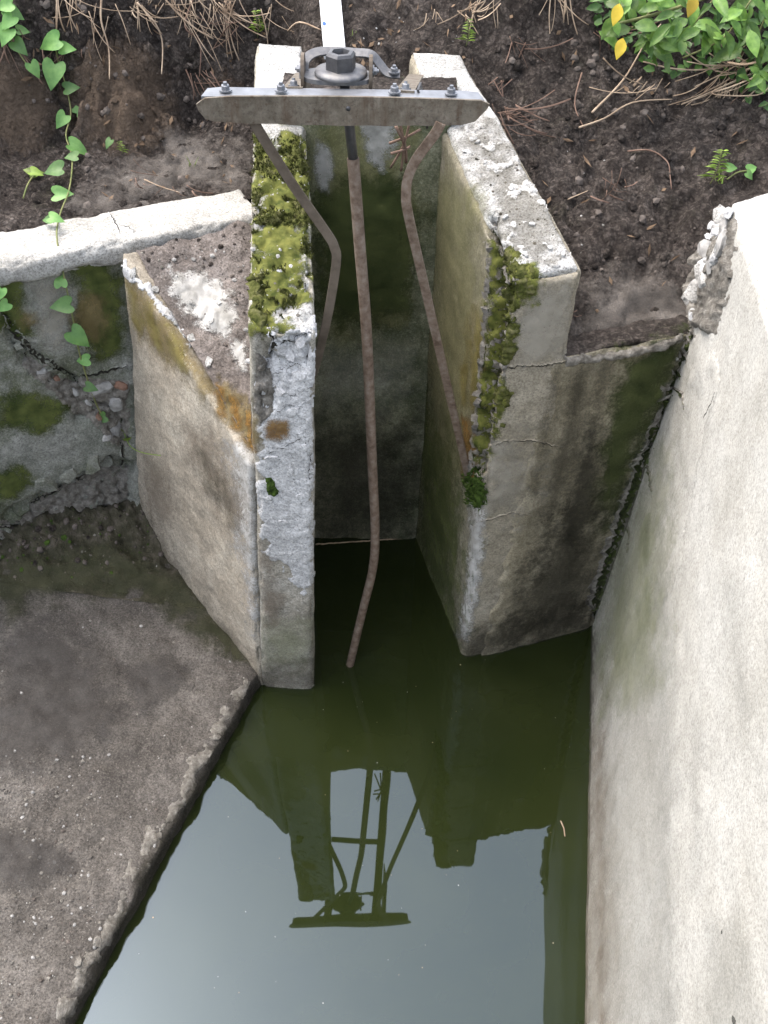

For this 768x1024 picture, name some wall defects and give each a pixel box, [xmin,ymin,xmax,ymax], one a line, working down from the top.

crack [2,314,128,469]
crack [108,212,136,236]
leakage [126,283,214,396]
peeling [121,259,317,596]
leakage [188,432,282,638]
rust [214,377,290,453]
crack [467,223,567,476]
leakage [456,432,598,656]
crack [585,326,715,619]
spalling [563,204,738,367]
spalling [56,678,250,1024]